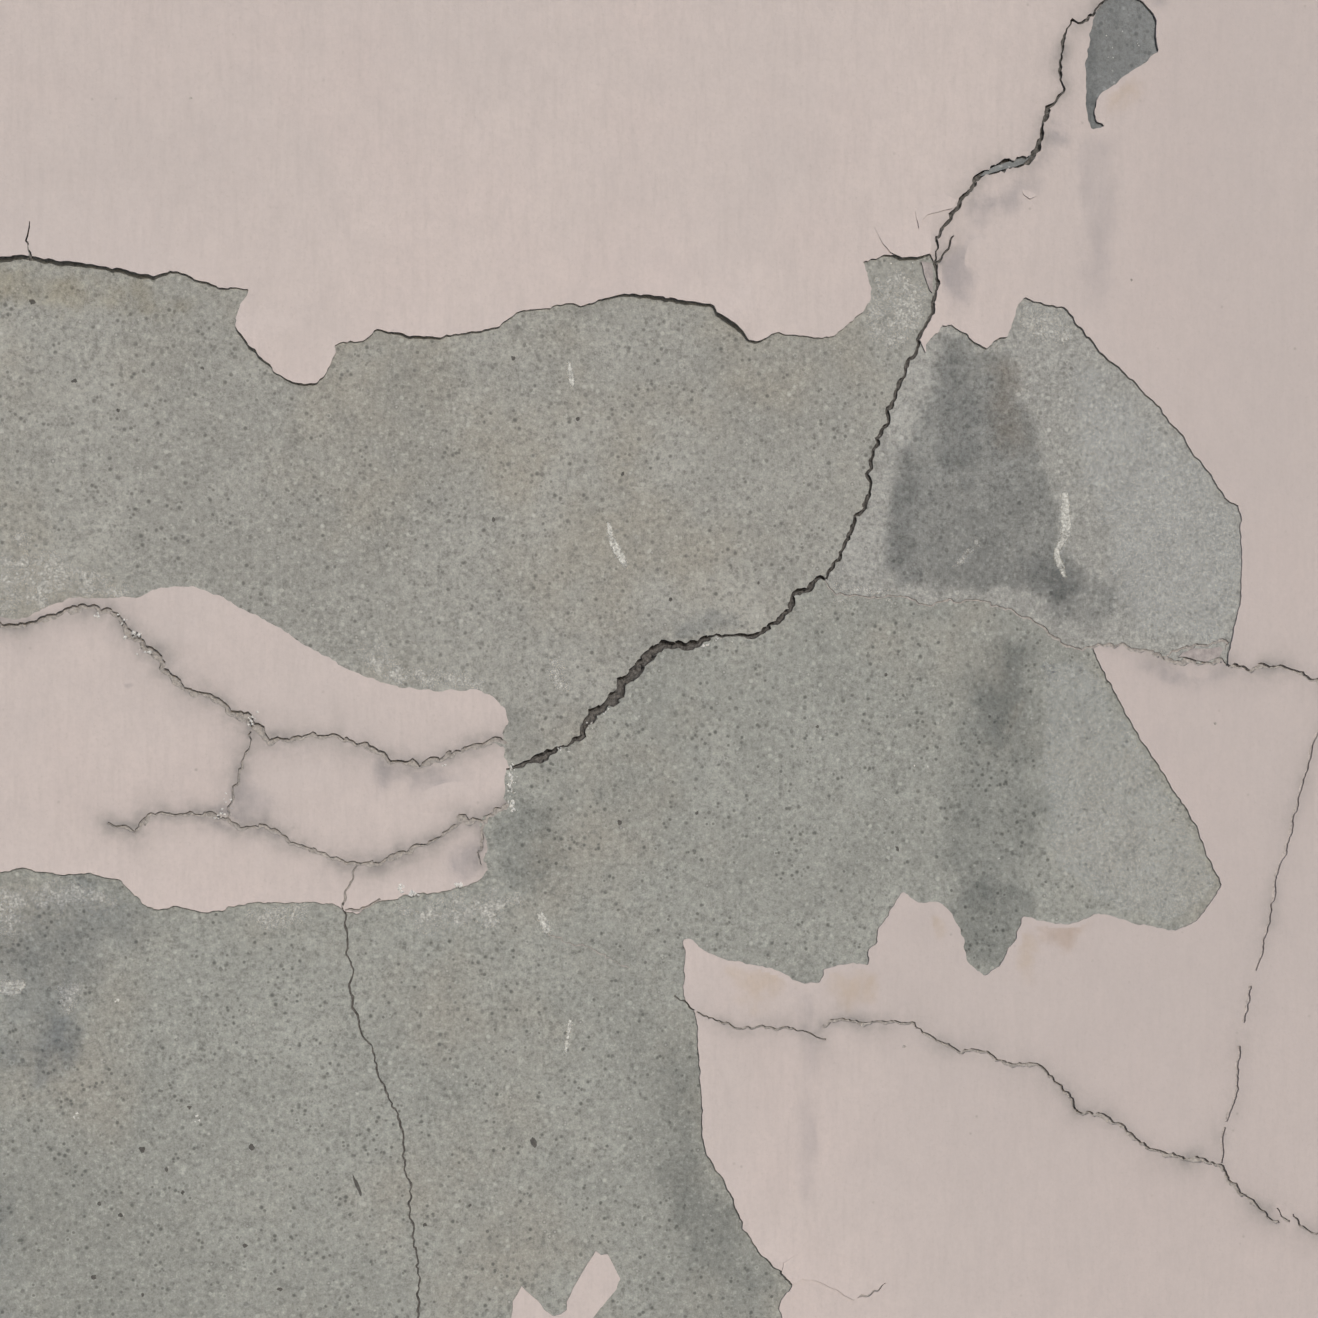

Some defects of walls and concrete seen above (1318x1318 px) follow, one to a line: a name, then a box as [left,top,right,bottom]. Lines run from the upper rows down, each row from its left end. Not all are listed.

crack [0,603,509,1318]
peeling [0,239,1242,1318]
crack [506,0,1318,770]
crack [674,729,1318,1234]
efflorescence [1054,492,1071,577]
peeling [1079,0,1158,129]